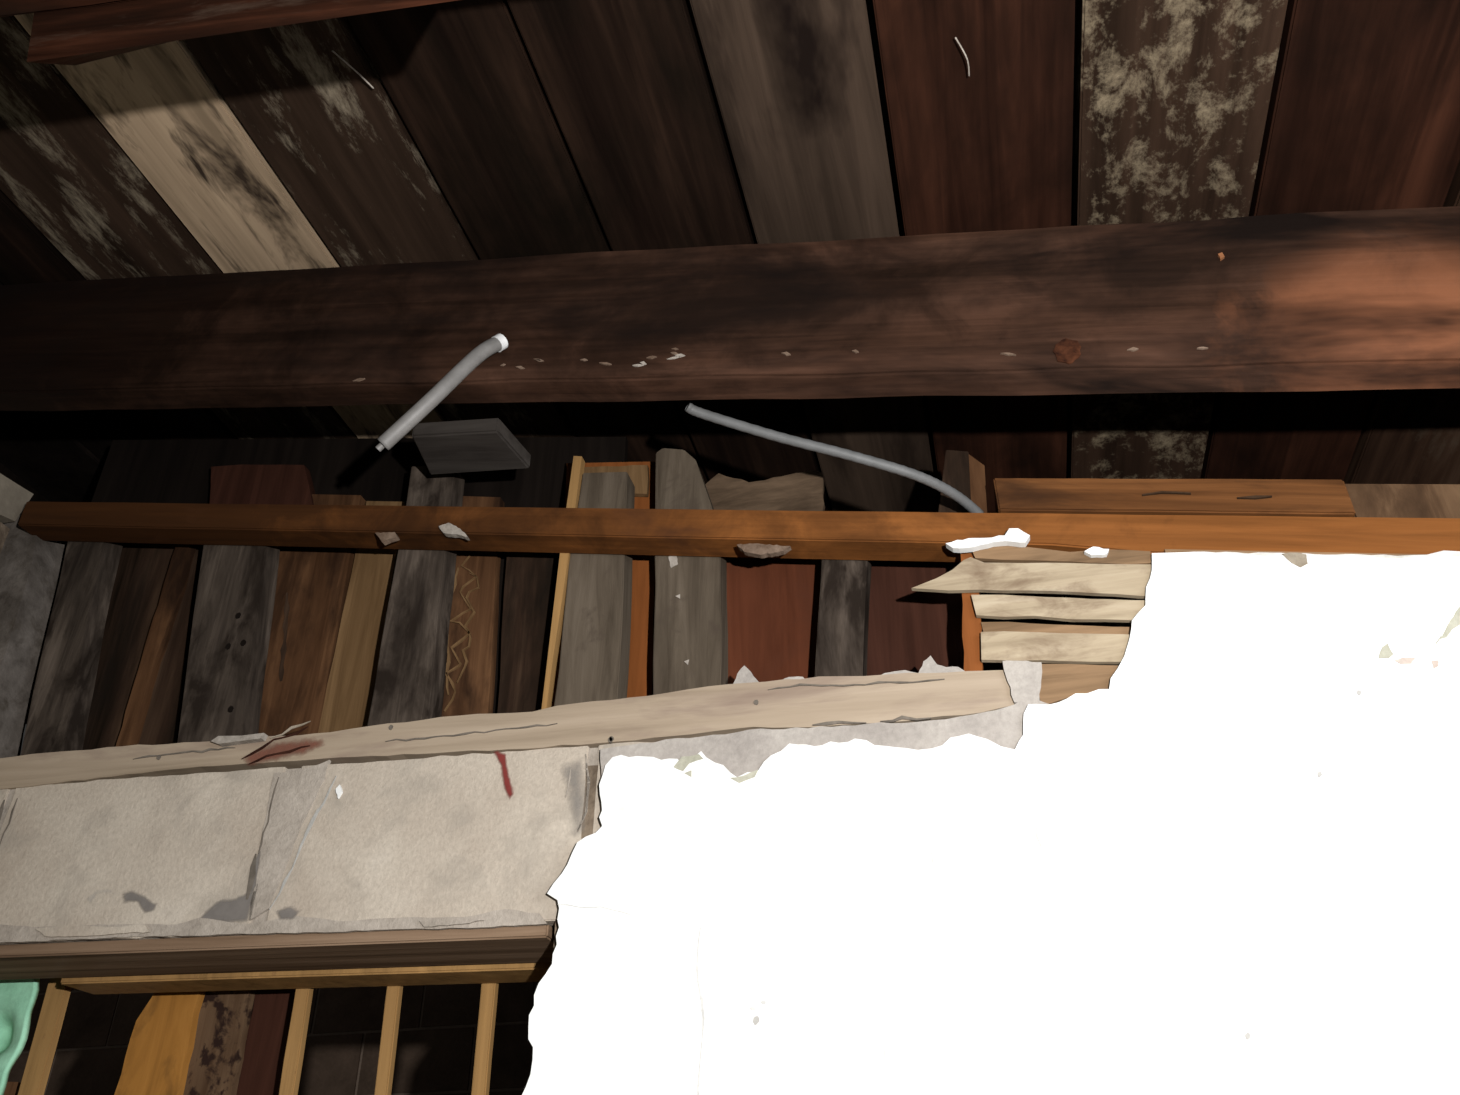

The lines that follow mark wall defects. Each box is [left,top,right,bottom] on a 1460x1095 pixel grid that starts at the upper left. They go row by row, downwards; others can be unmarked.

flaking render [737,543,792,559]
flaking render [946,528,1030,553]
flaking render [1084,547,1109,558]
flaking render [1378,598,1460,668]
flaking render [674,754,703,777]
flaking render [731,770,758,783]